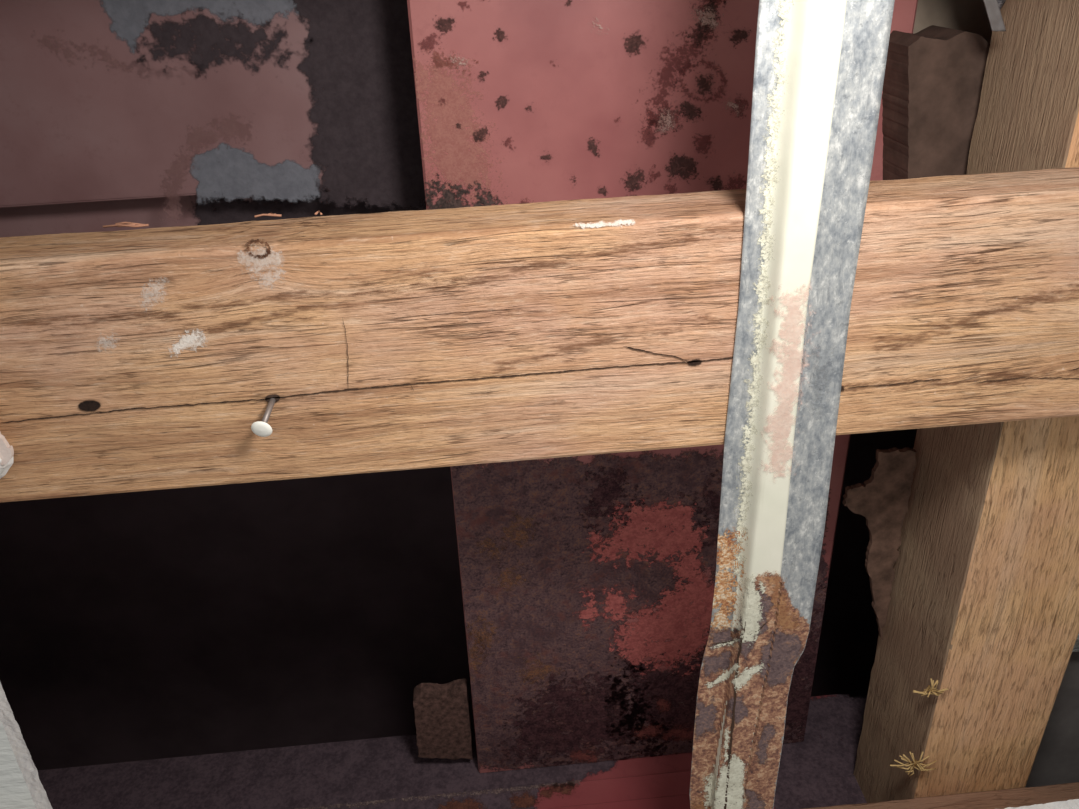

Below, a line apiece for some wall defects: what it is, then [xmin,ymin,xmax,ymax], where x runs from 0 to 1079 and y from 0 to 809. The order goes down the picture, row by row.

peeling [100,0,502,225]
corrosion [419,17,455,50]
corrosion [473,127,490,142]
corrosion [495,95,509,110]
corrosion [623,33,645,57]
corrosion [637,0,751,147]
corrosion [622,135,747,194]
peeling [575,0,793,679]
corrosion [38,448,868,809]
peeling [706,663,764,693]
peeling [634,697,694,742]
peeling [701,727,746,809]